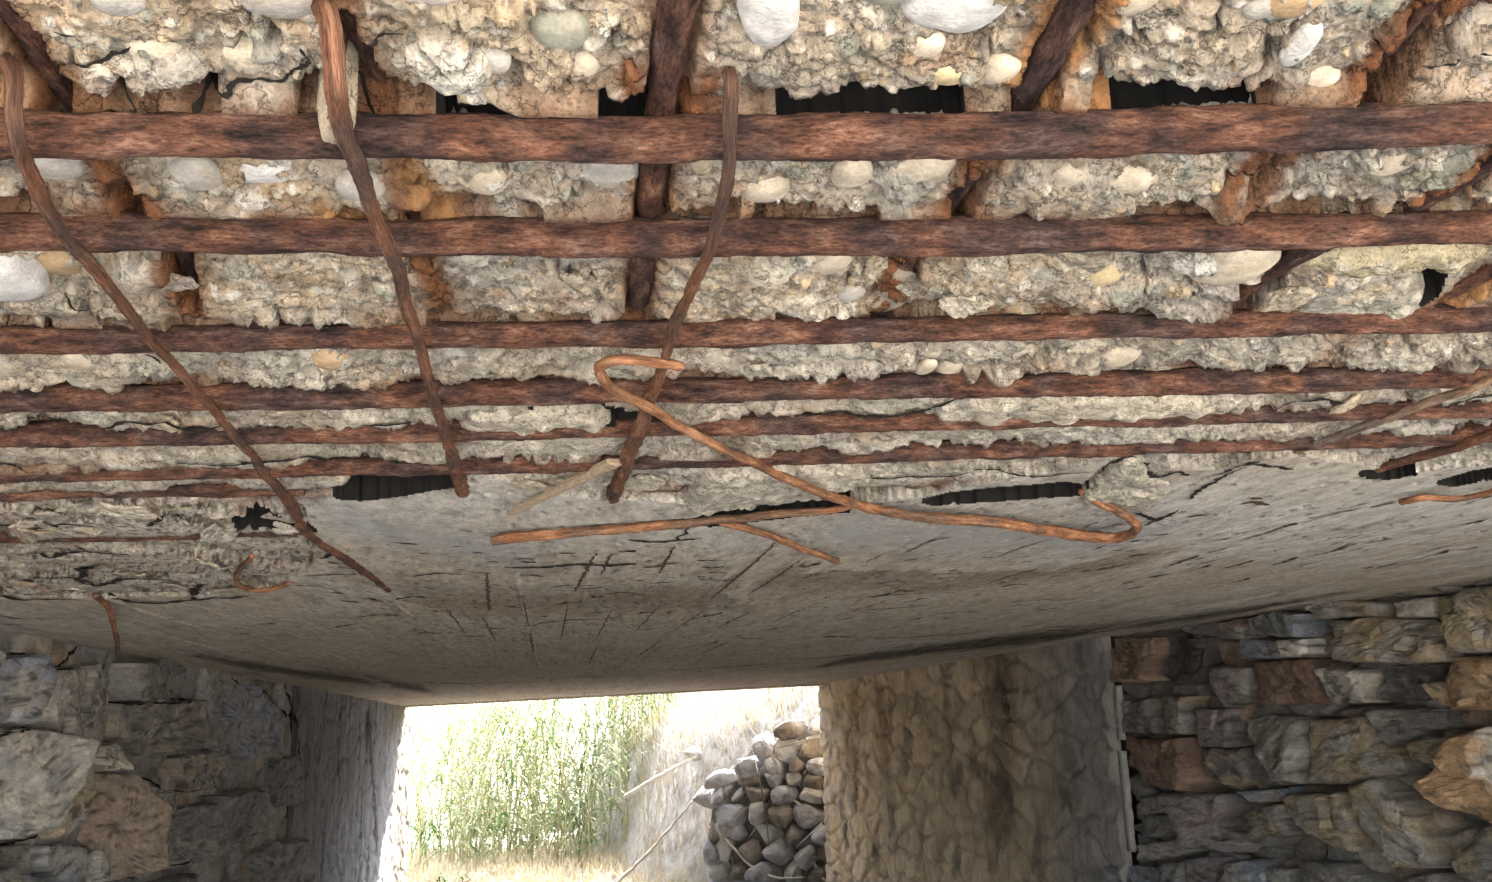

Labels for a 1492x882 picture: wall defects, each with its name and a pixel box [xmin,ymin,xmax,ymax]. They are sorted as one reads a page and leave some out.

spalling [0,0,657,223]
rust [617,58,644,102]
spalling [679,0,1049,115]
rust [93,160,168,220]
rust [316,159,459,221]
spalling [660,144,1492,227]
rust [152,252,201,319]
spalling [0,243,1492,600]
crack [1278,398,1345,409]
crack [1434,394,1492,408]
crack [867,456,1293,526]
crack [505,528,738,627]